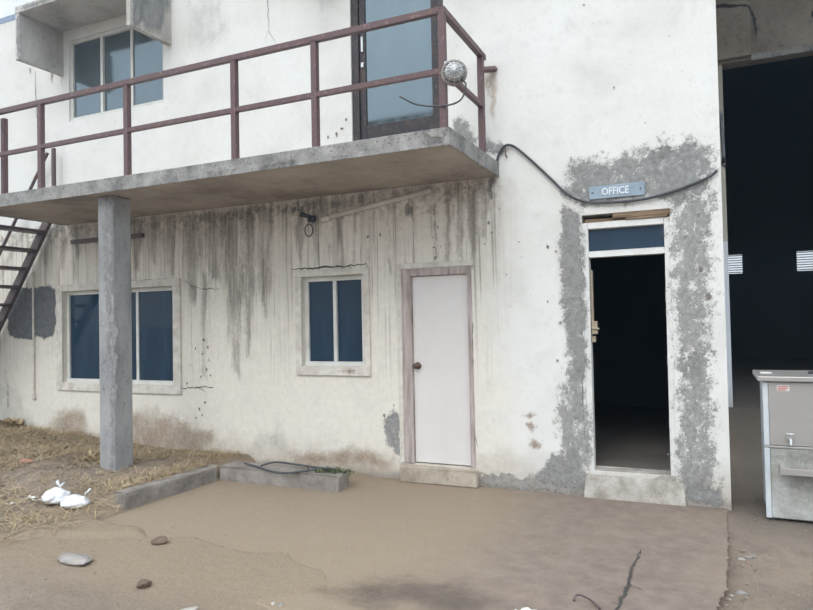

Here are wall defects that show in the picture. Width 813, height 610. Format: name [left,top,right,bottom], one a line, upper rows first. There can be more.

leakage [105,195,118,469]
crack [292,262,367,270]
flaking render [383,404,400,454]
peeling [664,191,722,507]